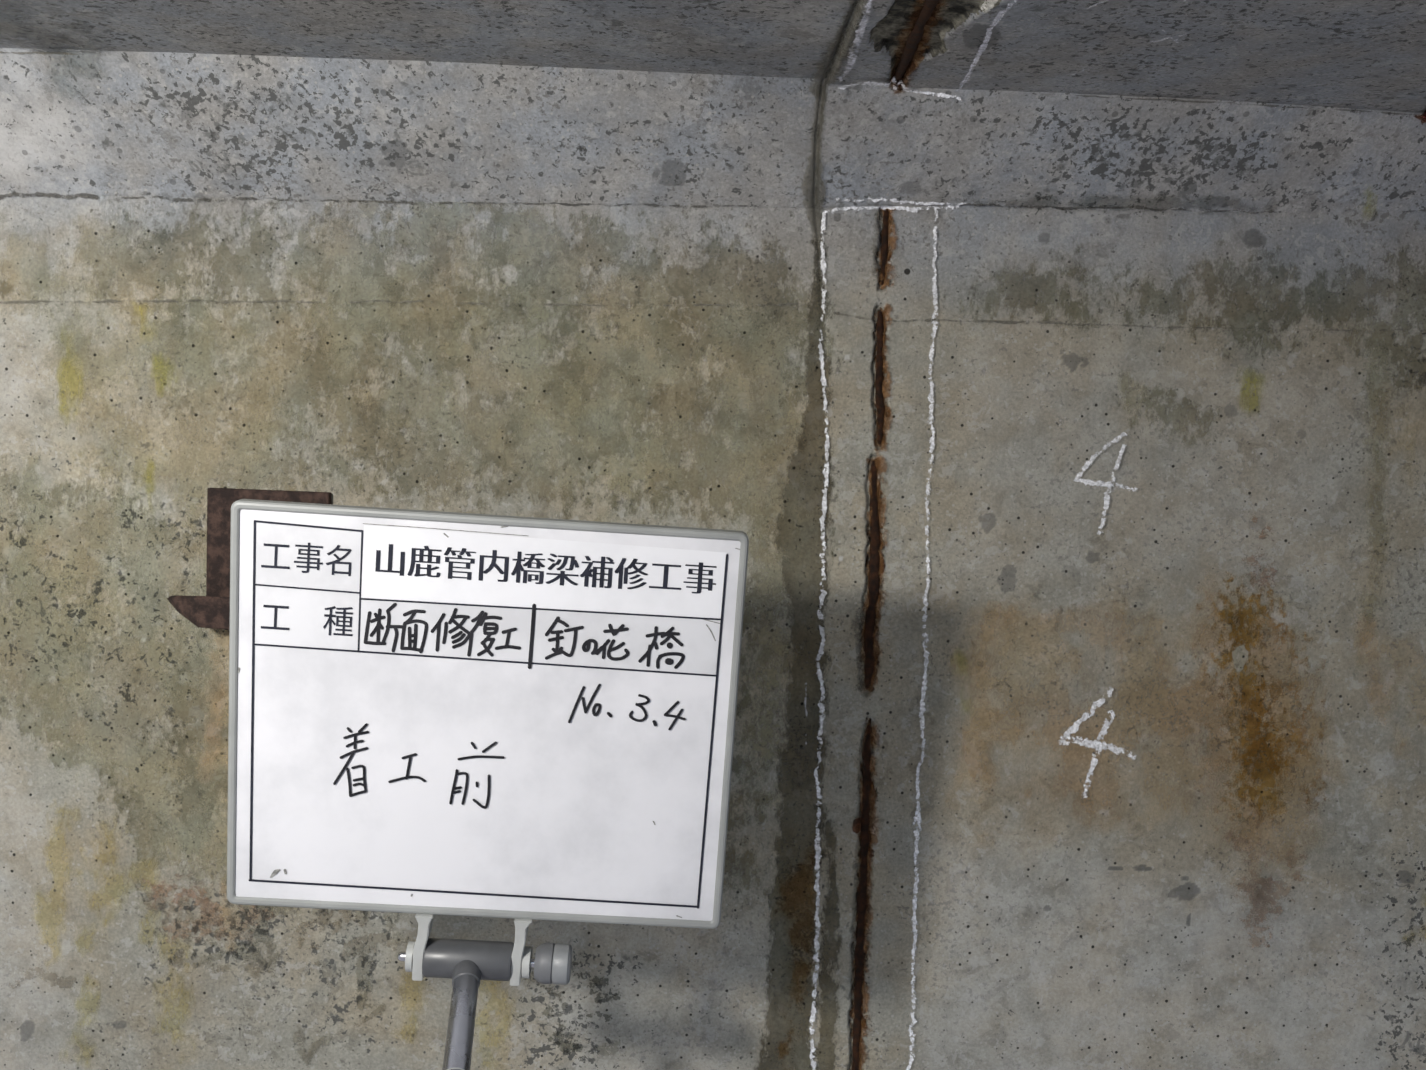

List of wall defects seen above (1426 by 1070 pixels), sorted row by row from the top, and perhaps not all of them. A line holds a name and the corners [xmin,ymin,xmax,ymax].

crack [0,192,747,208]
spalling [869,0,1001,94]
water stain [944,242,1426,630]
water stain [0,200,845,1070]
rust [954,517,1329,948]